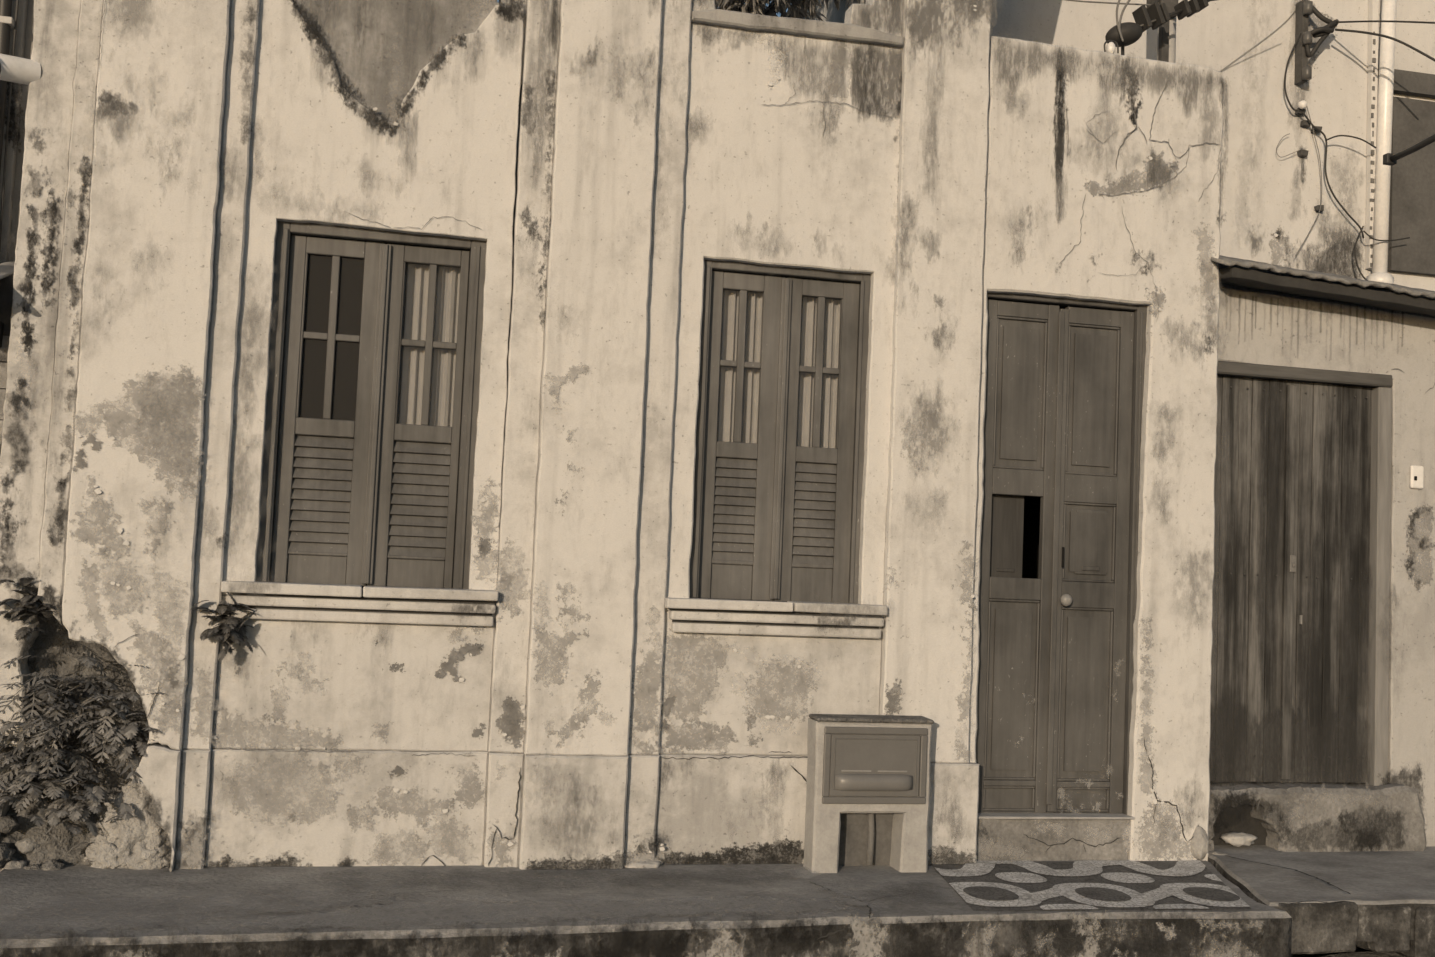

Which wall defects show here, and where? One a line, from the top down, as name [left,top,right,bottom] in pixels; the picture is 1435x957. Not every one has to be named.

leakage [19,157,92,356]
leakage [852,0,993,113]
leakage [998,42,1078,220]
crack [1059,74,1221,318]
leakage [1101,59,1228,191]
leakage [0,379,145,732]
spalling [0,367,210,872]
peeling [434,626,484,682]
peeling [470,480,518,614]
peeling [472,696,526,748]
peeling [630,608,815,755]
crack [1144,738,1199,843]